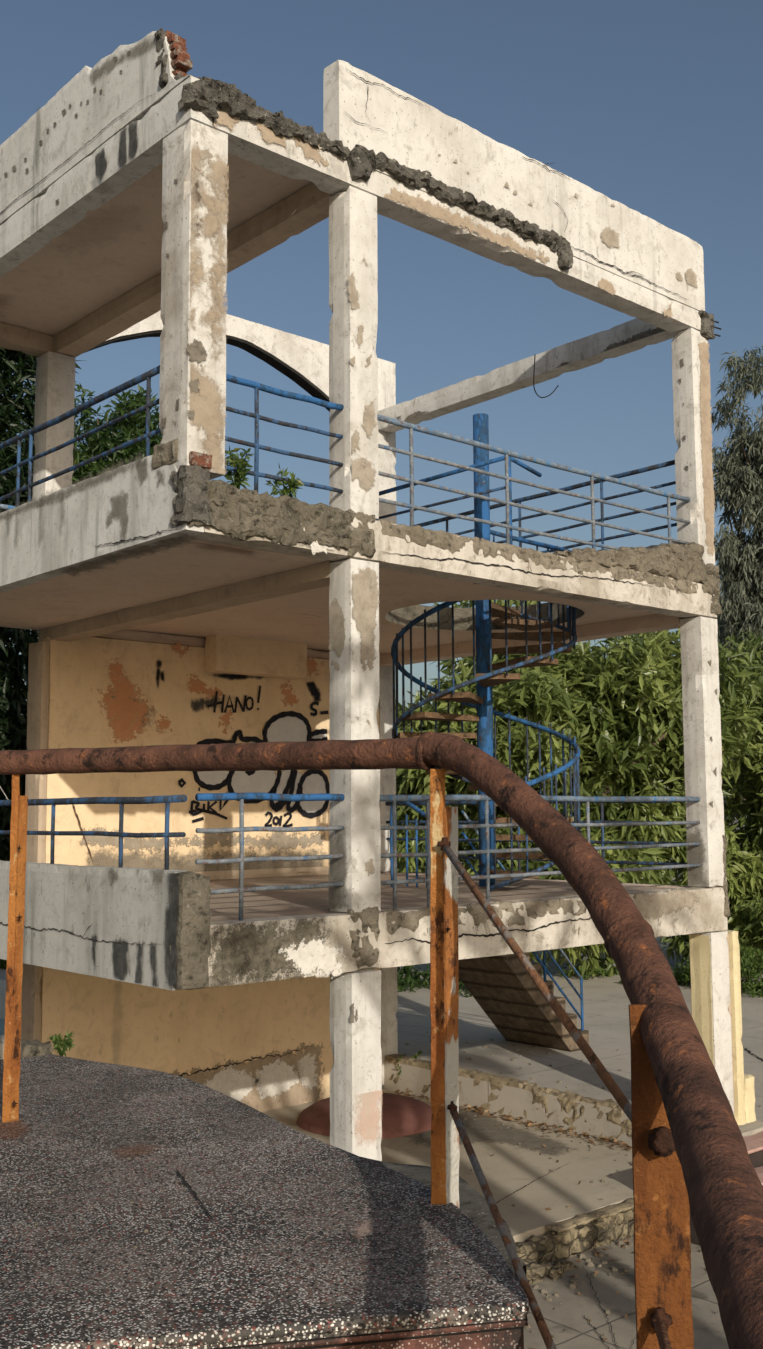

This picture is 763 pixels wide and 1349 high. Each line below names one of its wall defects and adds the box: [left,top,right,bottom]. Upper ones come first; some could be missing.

damp [95,118,138,179]
spalling [154,27,573,270]
spalling [152,258,722,676]
crack [387,552,656,586]
peeling [95,658,172,743]
crack [0,922,154,945]
damp [112,938,158,987]
flaking render [215,906,430,979]
spalling [458,897,587,927]
flaking render [628,887,700,919]
flaking render [166,1042,325,1112]